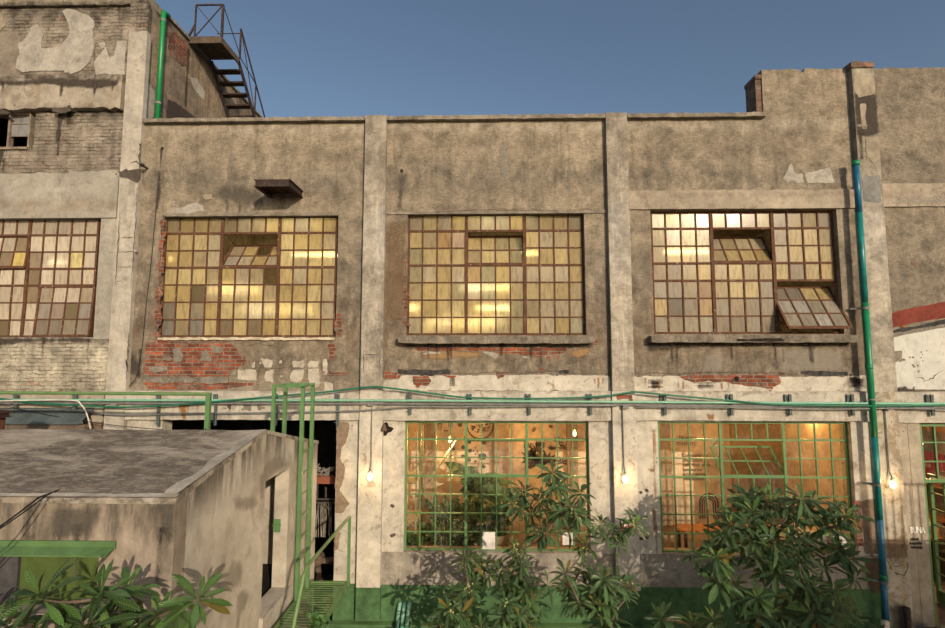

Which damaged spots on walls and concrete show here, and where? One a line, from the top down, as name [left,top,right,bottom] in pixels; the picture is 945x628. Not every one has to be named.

peeling [0,9,127,76]
spalling [52,105,73,114]
peeling [853,74,880,163]
peeling [783,164,834,184]
flaking render [144,194,347,391]
flaking render [363,350,431,388]
flaking render [415,345,570,376]
flaking render [680,373,784,391]
peeling [335,422,353,513]